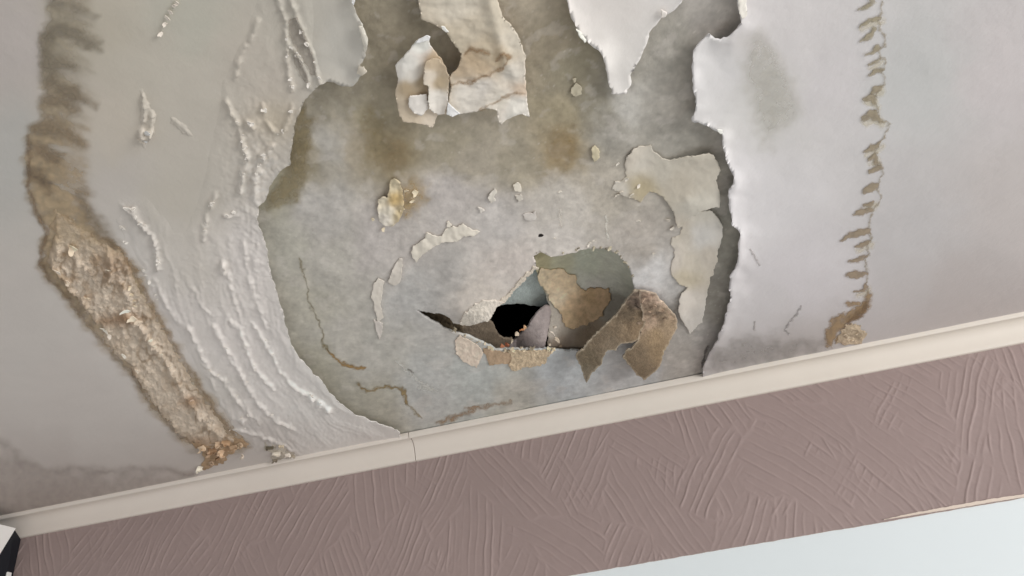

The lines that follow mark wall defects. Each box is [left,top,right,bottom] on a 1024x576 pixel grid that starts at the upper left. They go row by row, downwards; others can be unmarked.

damp [25,0,175,411]
spalling [47,209,244,474]
damp [182,364,242,439]
crack [318,320,421,417]
peeling [257,0,747,434]
damp [825,0,890,348]